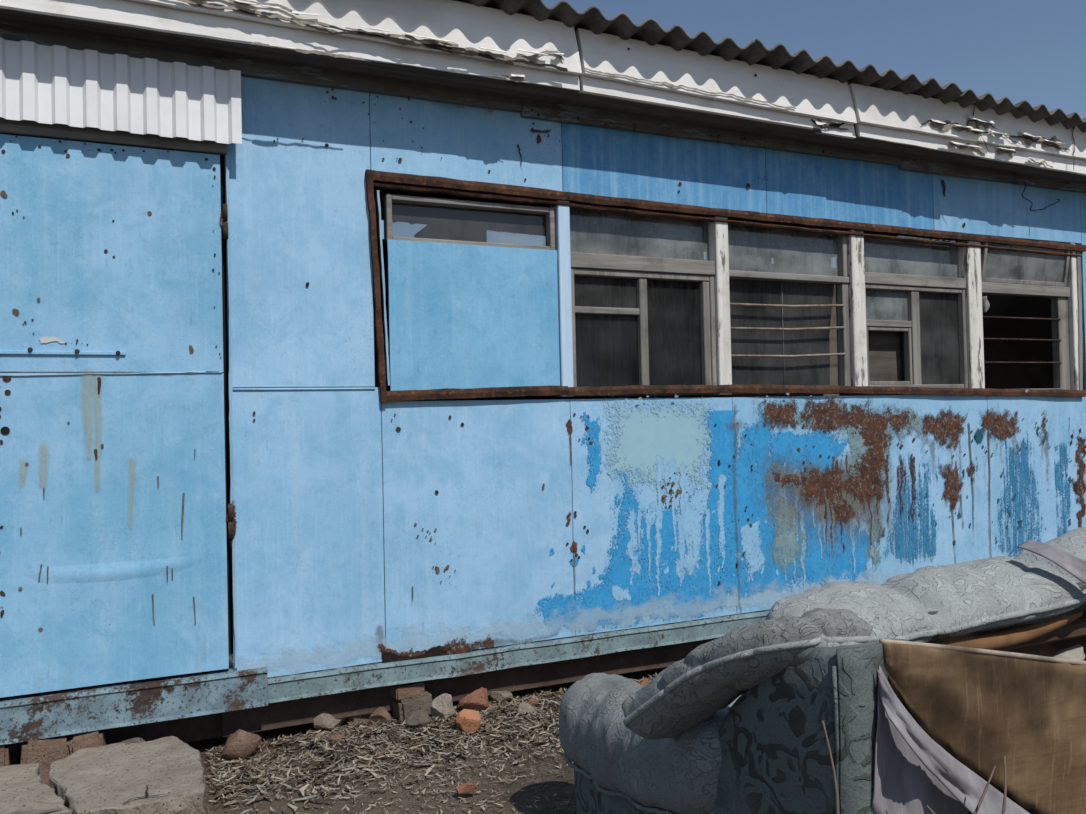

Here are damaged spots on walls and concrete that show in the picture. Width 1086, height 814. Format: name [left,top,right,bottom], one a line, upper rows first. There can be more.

peeling [178,0,568,82]
peeling [811,119,848,130]
peeling [926,112,1067,168]
corrosion [12,309,88,345]
corrosion [19,371,219,490]
corrosion [226,499,237,544]
peeling [534,393,984,633]
corrosion [759,393,1051,563]
peeling [992,416,1076,557]
corrosion [1071,428,1086,527]
corrosion [377,644,426,657]
corrosion [443,634,495,655]